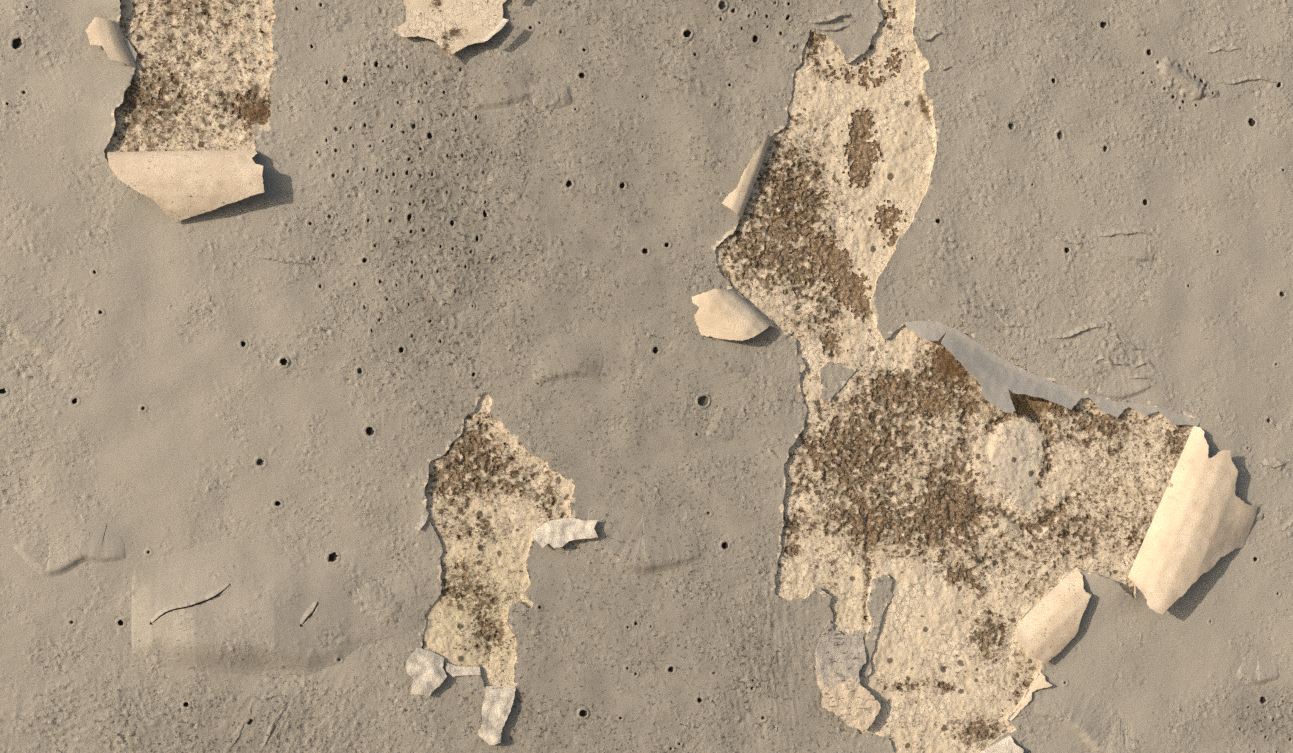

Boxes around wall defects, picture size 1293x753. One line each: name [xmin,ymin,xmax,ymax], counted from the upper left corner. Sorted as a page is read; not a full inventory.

peeling [85,0,279,222]
peeling [392,0,508,58]
peeling [692,0,1257,753]
peeling [406,393,598,745]